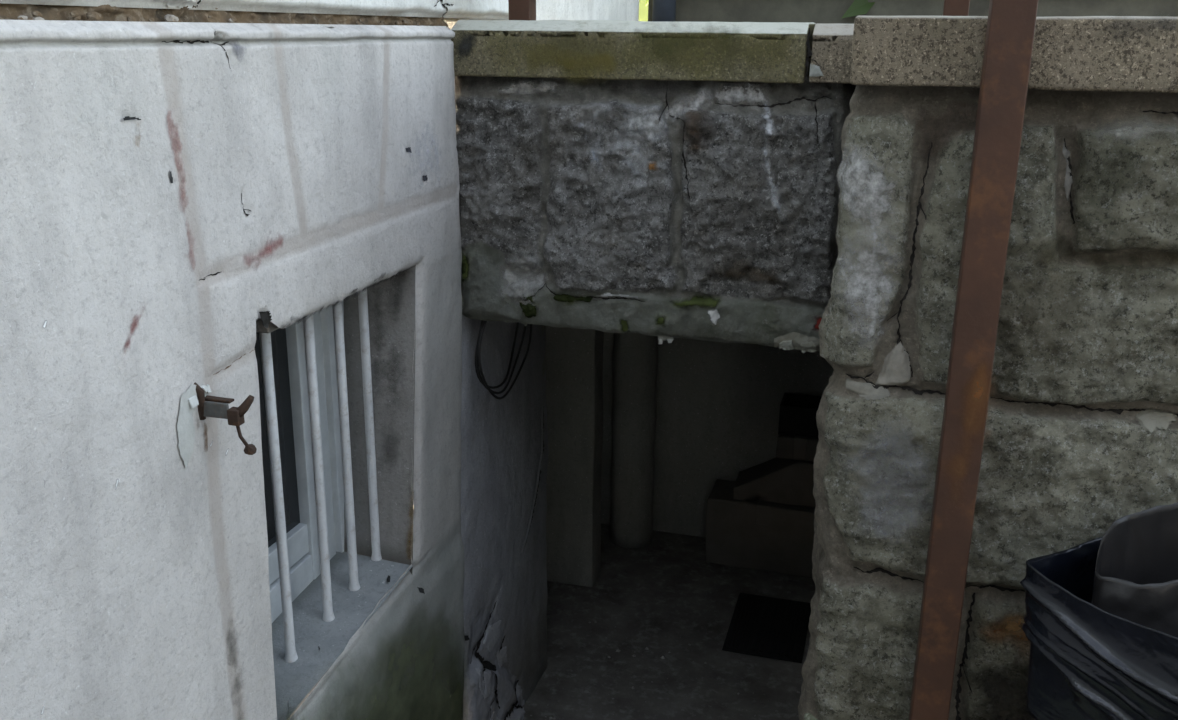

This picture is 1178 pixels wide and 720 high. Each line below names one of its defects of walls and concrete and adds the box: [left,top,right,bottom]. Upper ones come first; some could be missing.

spalling [0,0,448,42]
crack [658,81,690,201]
crack [715,28,831,144]
crack [1143,108,1178,116]
damp [502,257,545,302]
crack [846,142,945,395]
peeling [464,610,525,720]